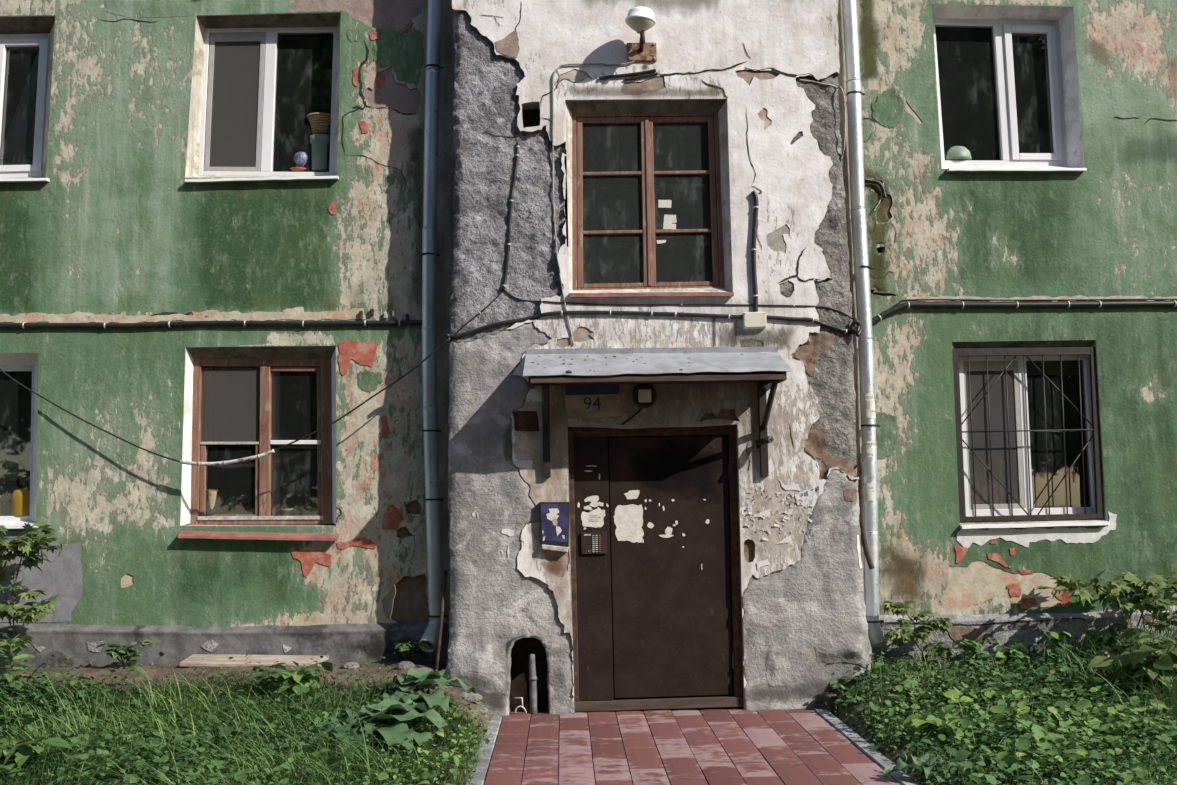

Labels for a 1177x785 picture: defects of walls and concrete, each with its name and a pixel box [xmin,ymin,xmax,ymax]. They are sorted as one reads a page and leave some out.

peeling [290,0,424,114]
spalling [495,31,519,57]
crack [660,42,815,193]
crack [1115,116,1177,125]
peeling [357,370,383,393]
flaking render [794,333,835,387]
flaking render [803,424,858,501]
peeling [382,500,422,538]
peeling [544,548,569,577]
hole [744,539,755,562]
spalling [382,574,429,622]
peeling [943,540,1080,662]